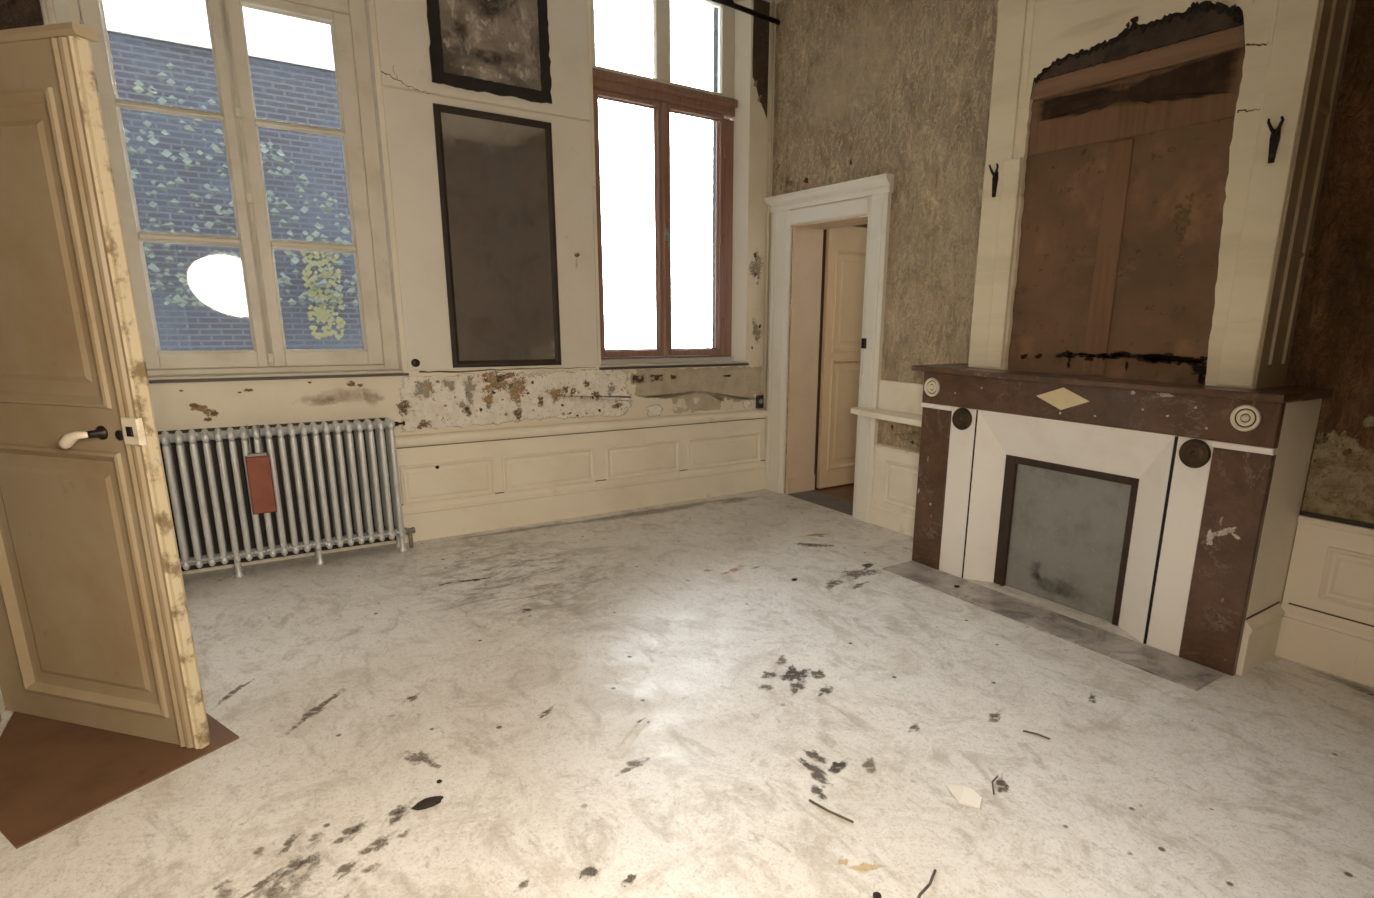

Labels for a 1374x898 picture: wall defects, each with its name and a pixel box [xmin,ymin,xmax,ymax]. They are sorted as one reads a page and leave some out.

peeling [750,252,763,285]
peeling [397,366,762,432]